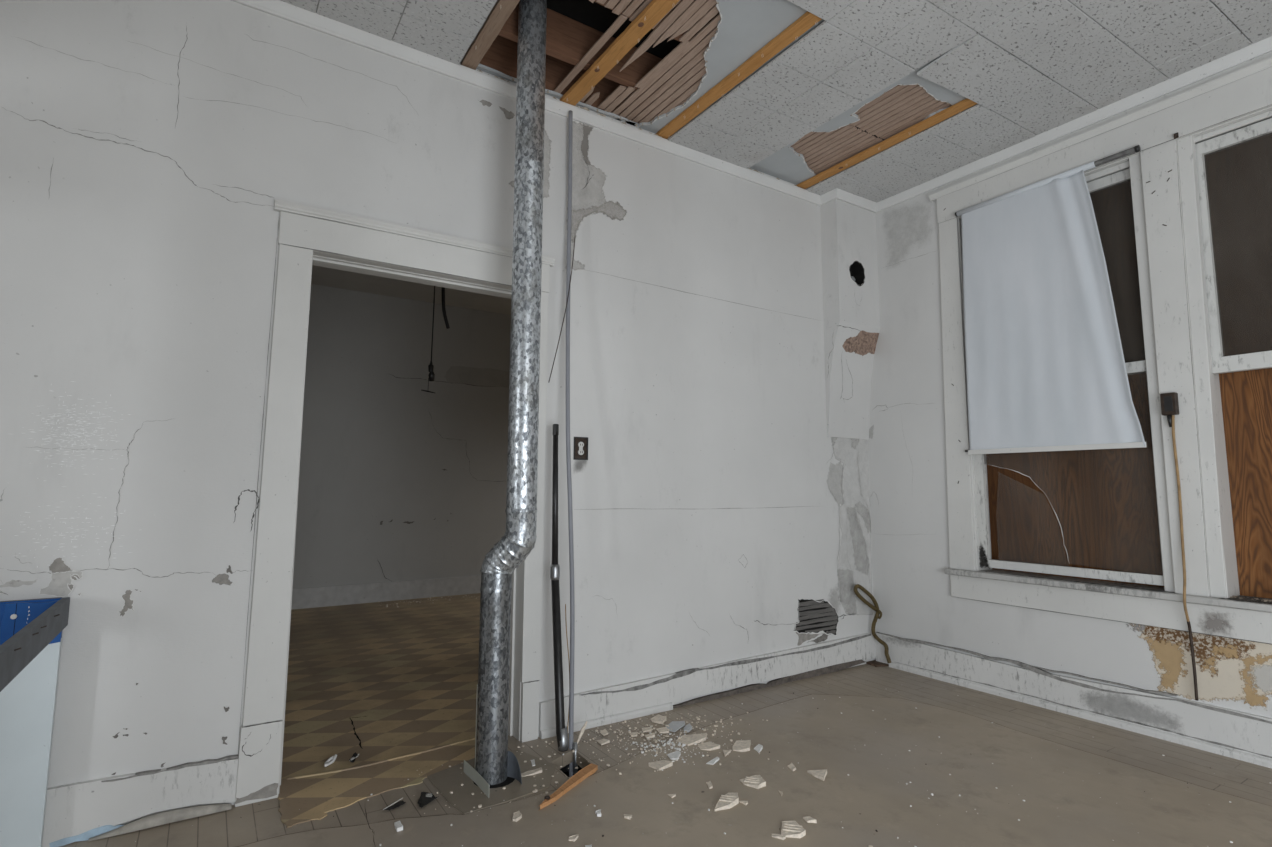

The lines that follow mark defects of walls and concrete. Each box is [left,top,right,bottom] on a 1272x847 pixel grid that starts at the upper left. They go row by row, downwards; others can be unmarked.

crack [17,23,397,144]
flaking render [575,0,722,137]
peeling [478,99,516,120]
crack [4,108,274,207]
flaking render [842,330,879,356]
crack [28,419,246,578]
crack [234,489,259,530]
peeling [0,557,83,597]
peeling [212,565,233,585]
flaking render [794,599,854,646]